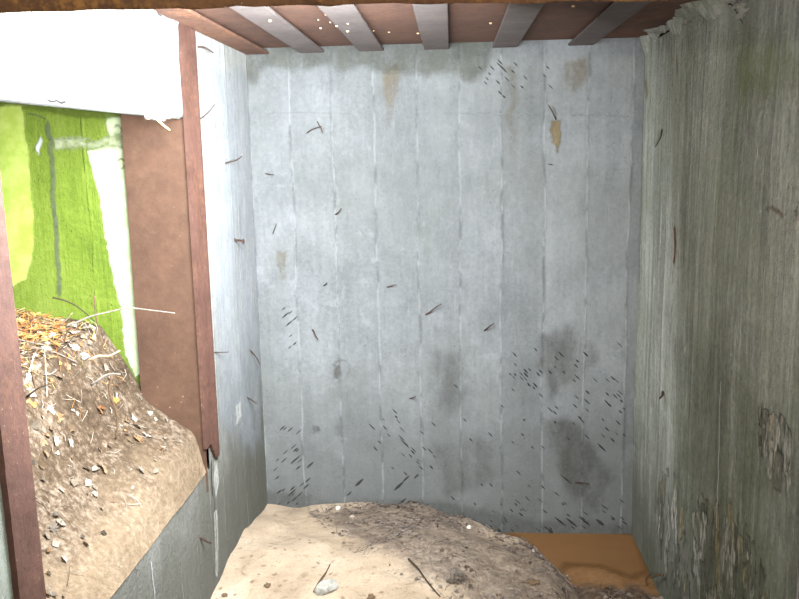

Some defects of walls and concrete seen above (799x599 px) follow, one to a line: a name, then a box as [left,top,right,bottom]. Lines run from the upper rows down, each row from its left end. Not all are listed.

spalling [640,0,749,56]
rust [550,121,561,152]
peeling [758,406,792,495]
peeling [654,468,766,599]